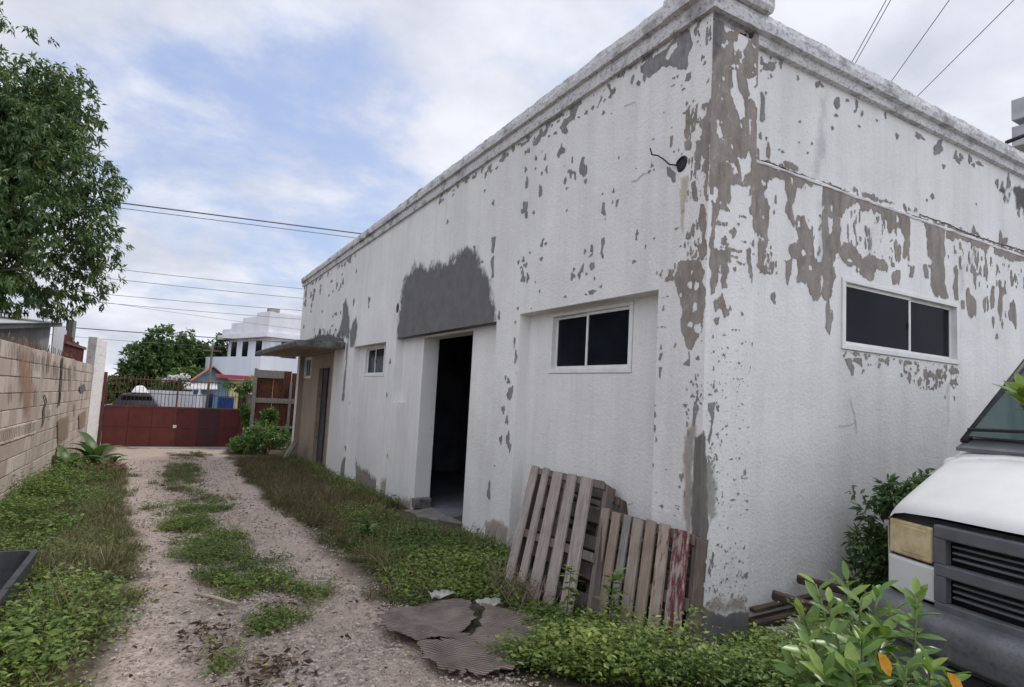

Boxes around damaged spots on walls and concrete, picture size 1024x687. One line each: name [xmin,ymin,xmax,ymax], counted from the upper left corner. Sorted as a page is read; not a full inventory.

peeling [303,254,357,404]
peeling [437,19,1024,611]
water stain [683,426,716,539]